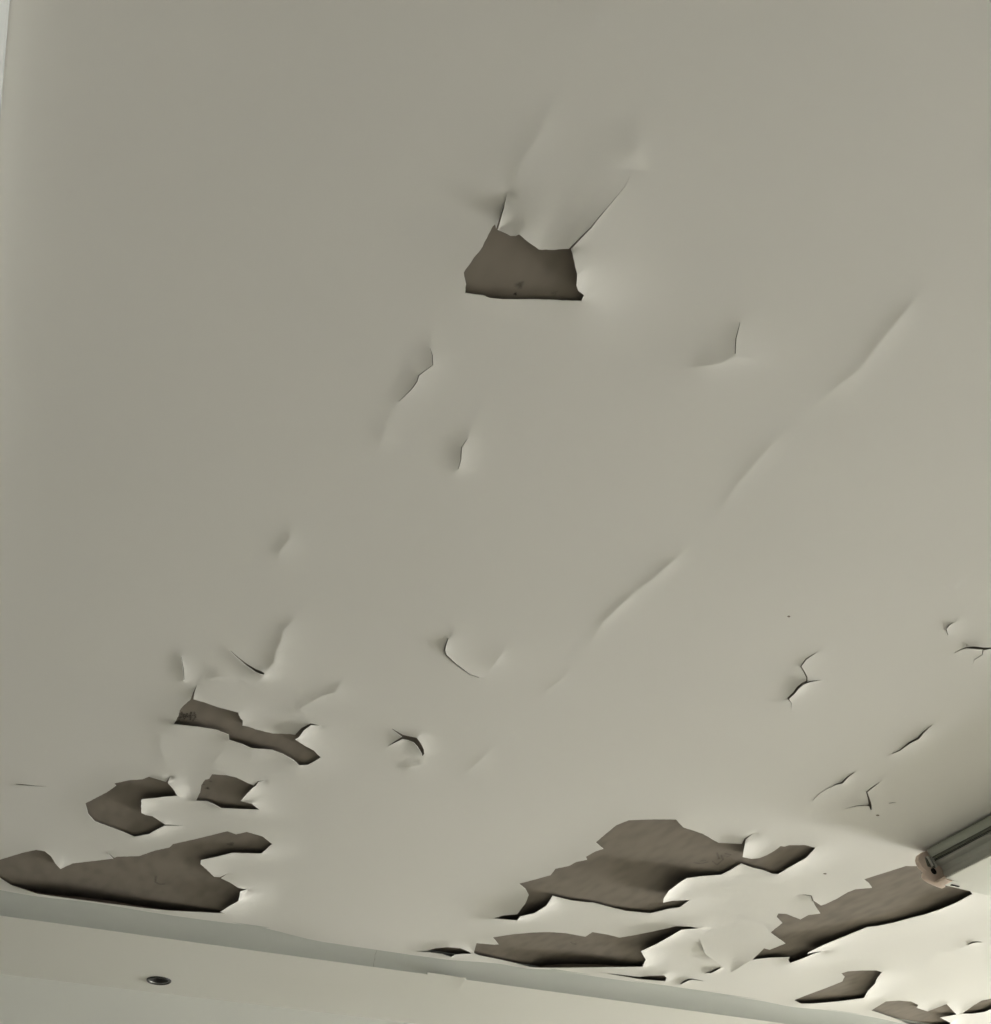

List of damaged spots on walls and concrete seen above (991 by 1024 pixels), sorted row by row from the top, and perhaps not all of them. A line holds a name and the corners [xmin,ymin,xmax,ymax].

peeling [458,118,650,325]
crack [941,621,991,666]
crack [775,650,828,713]
peeling [158,682,332,773]
crack [384,727,435,771]
crack [888,723,937,756]
crack [810,771,899,811]
peeling [0,769,295,920]
peeling [394,813,991,1024]